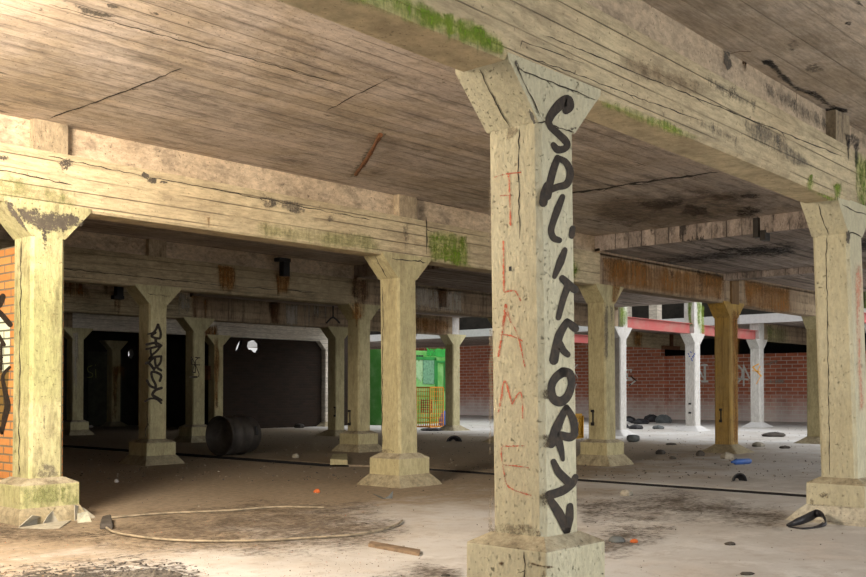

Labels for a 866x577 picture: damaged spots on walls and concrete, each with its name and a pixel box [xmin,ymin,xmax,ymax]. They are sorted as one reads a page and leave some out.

crack [51,68,182,118]
crack [517,36,841,156]
crack [480,70,521,238]
crack [572,172,718,194]
spalling [5,201,26,230]